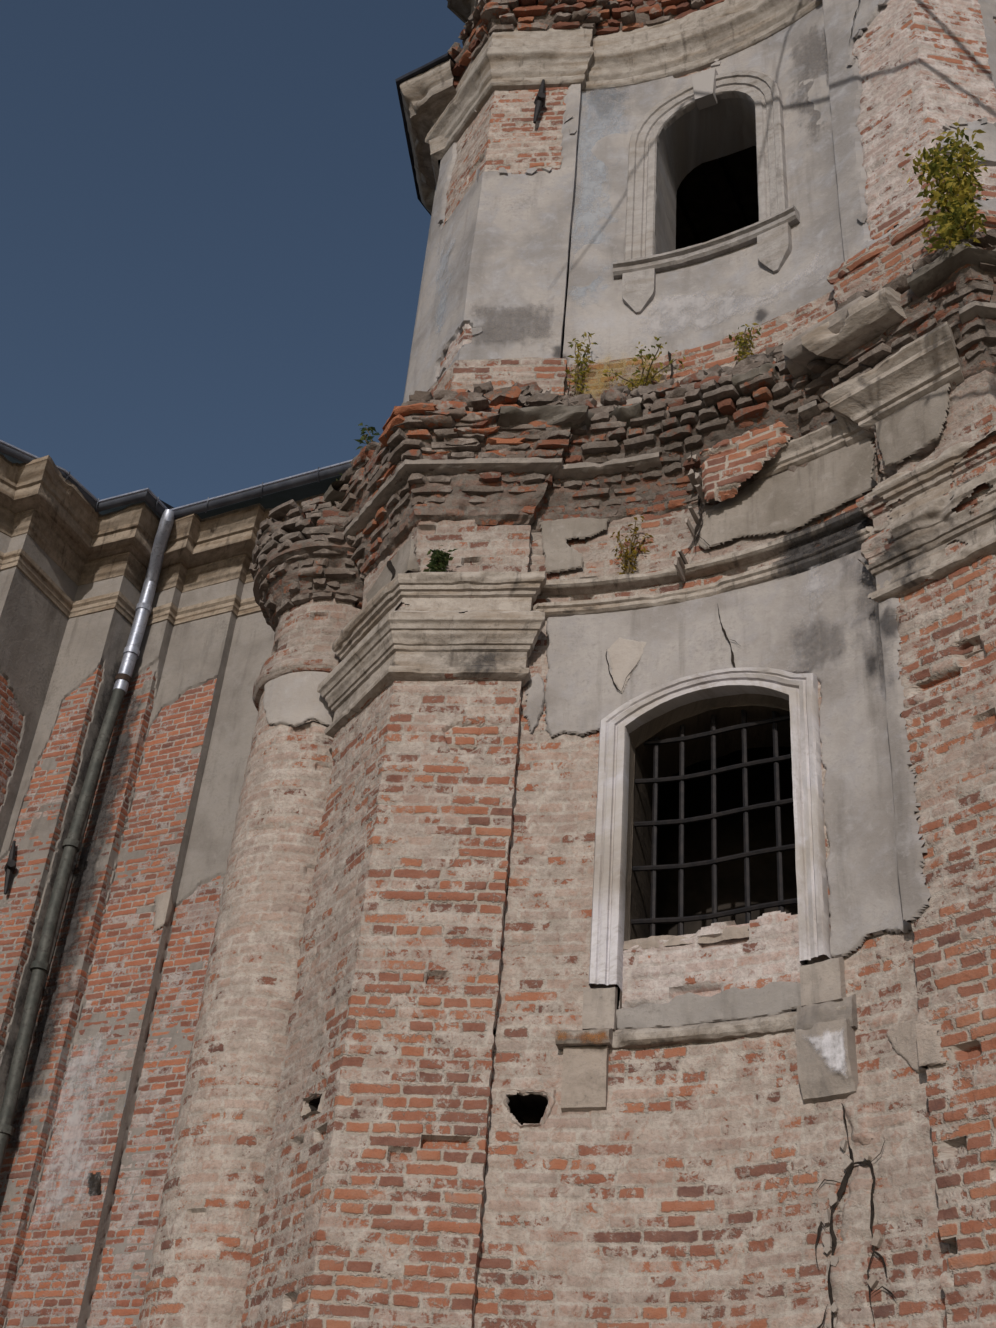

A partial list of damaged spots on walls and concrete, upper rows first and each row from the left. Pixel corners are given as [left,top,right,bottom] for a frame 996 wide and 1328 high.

flaking render [438,87,577,226]
flaking render [847,0,996,240]
flaking render [700,421,793,503]
crack [717,604,739,668]
flaking render [0,664,224,1328]
hole [500,1088,556,1129]
crack [815,1103,896,1328]